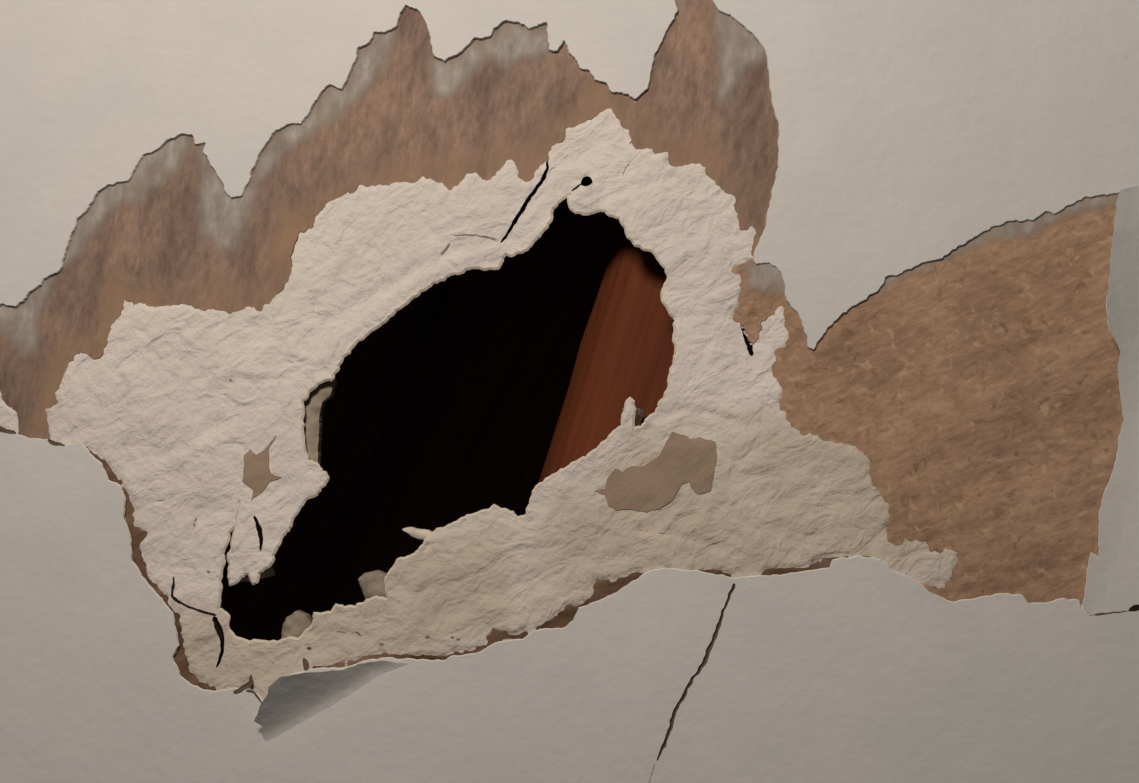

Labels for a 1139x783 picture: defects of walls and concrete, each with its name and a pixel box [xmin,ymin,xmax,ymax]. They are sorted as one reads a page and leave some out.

crack [441,162,549,255]
flaking render [0,392,19,434]
flaking render [45,109,958,700]
crack [253,516,263,551]
crack [171,576,224,668]
crack [1095,604,1139,615]
crack [233,675,262,702]
crack [648,583,735,783]